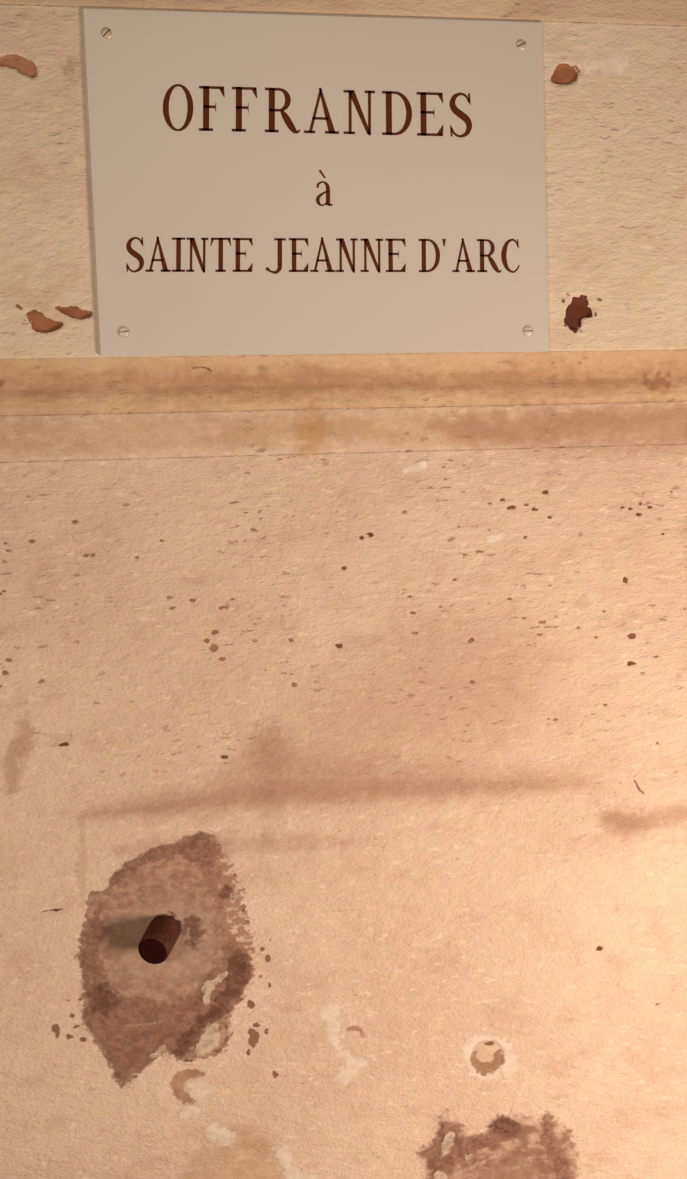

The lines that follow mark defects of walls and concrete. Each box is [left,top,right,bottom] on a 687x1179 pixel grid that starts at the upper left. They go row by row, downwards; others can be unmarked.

spalling [0,54,37,78]
spalling [551,53,629,85]
spalling [16,305,92,333]